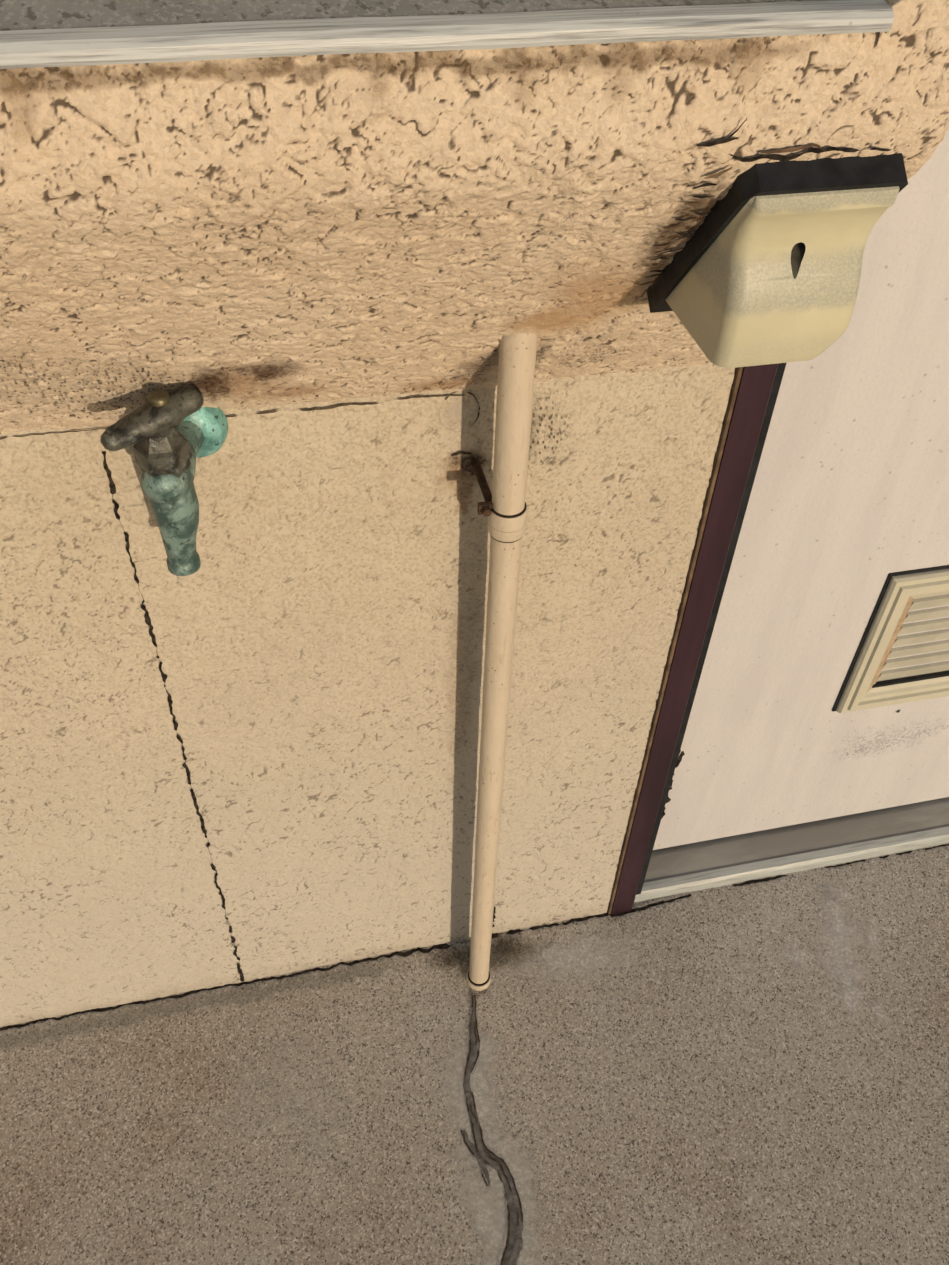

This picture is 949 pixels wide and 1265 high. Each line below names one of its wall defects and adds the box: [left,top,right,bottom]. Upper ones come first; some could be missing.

crack [697,118,747,147]
crack [226,393,475,417]
rust [451,451,486,475]
crack [0,428,692,1031]
crack [819,844,949,869]
crack [732,875,787,886]
crack [460,995,523,1265]